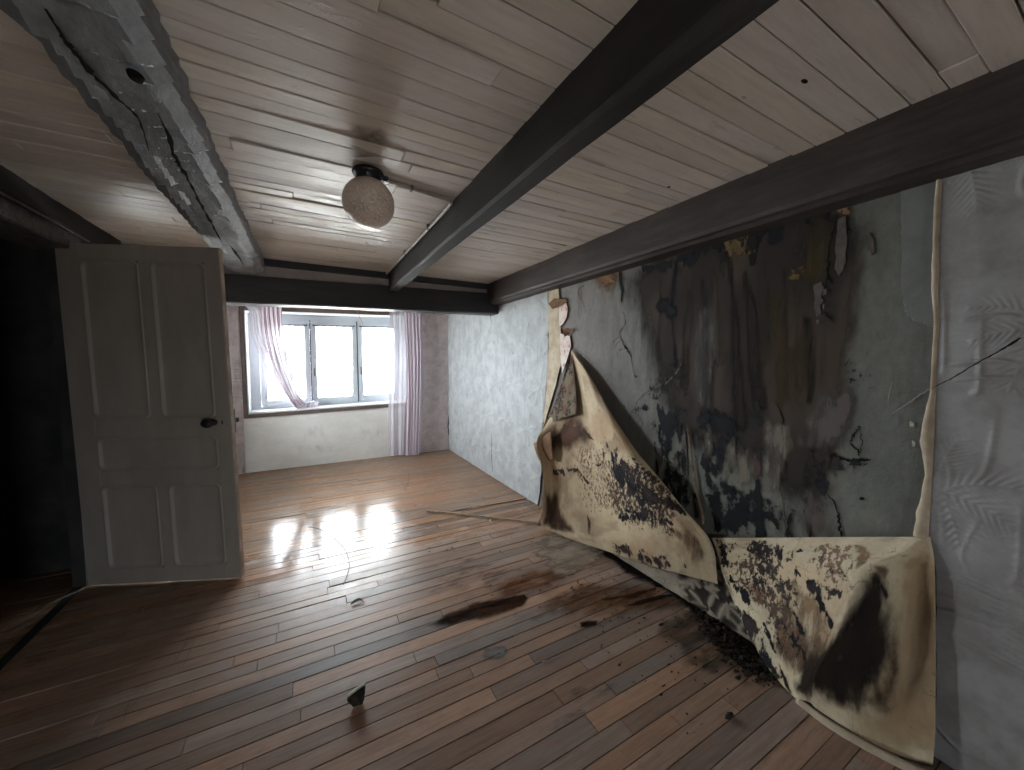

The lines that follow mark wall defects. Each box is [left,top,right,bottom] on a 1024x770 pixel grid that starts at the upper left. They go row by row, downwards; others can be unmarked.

crack [44,8,244,265]
water stain [433,210,897,706]
peeling [813,282,827,325]
crack [888,338,1021,415]